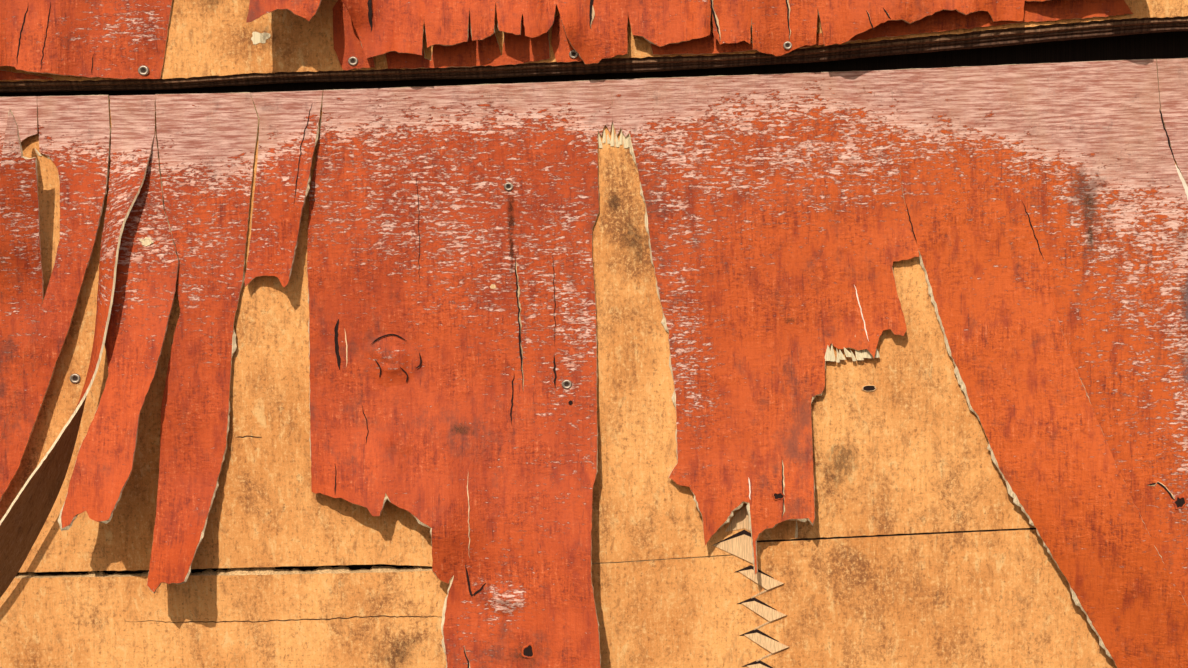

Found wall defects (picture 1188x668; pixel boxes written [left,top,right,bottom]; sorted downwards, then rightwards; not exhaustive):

crack [1159,108,1188,199]
crack [1023,204,1043,257]
crack [1148,481,1175,500]